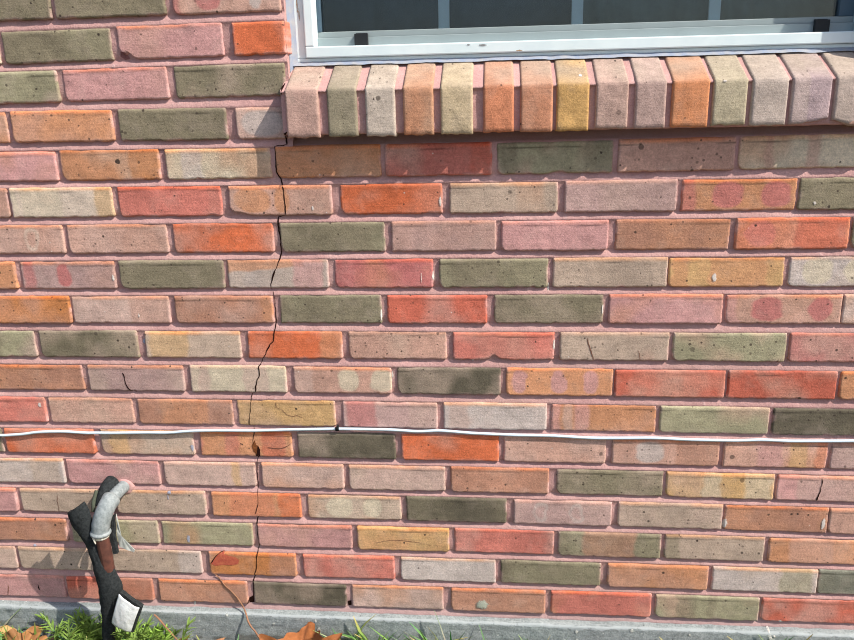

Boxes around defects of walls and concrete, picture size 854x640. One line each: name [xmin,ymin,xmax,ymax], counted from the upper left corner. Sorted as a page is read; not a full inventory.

crack [249,132,289,595]